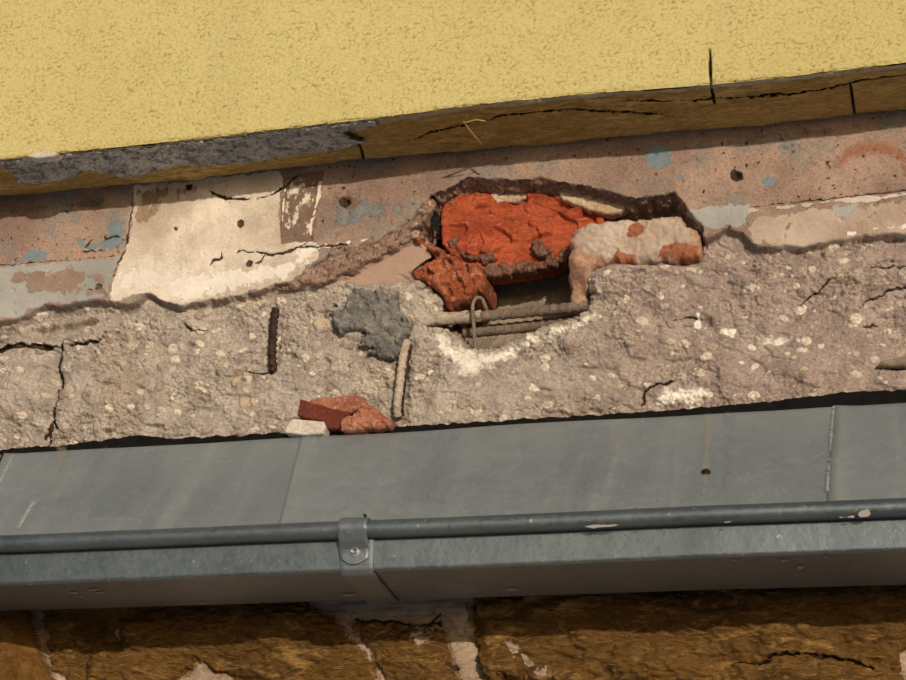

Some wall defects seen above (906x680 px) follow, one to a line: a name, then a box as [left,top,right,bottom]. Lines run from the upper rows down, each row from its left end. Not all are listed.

crack [406,52,906,142]
spalling [0,120,906,450]
crack [800,277,833,306]
crack [859,265,906,329]
crack [0,339,102,447]